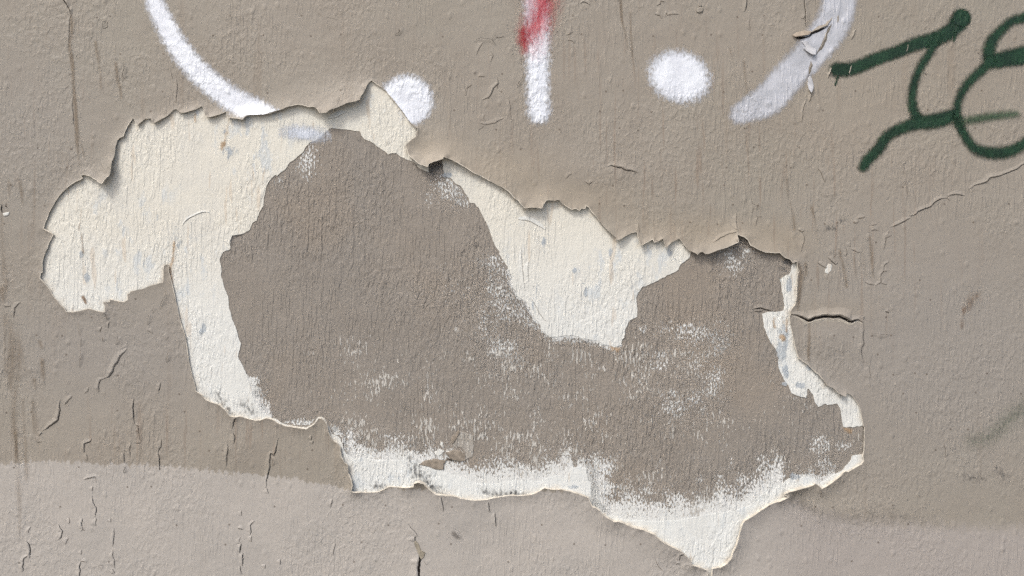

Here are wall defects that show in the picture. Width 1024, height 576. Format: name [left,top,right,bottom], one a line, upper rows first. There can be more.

peeling [792,18,832,55]
crack [752,161,1024,378]
peeling [38,77,865,576]
crack [35,313,127,443]
crack [57,352,172,576]
crack [222,417,236,465]
crack [263,438,278,493]
crack [18,526,31,572]
crack [235,511,281,574]